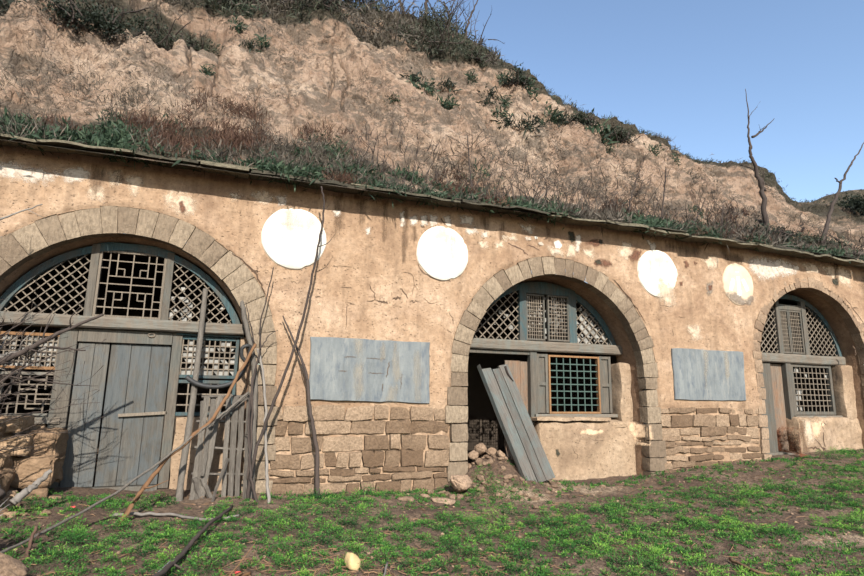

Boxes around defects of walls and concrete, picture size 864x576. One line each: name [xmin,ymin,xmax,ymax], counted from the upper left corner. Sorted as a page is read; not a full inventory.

peeling [400,212,612,267]
peeling [618,240,656,260]